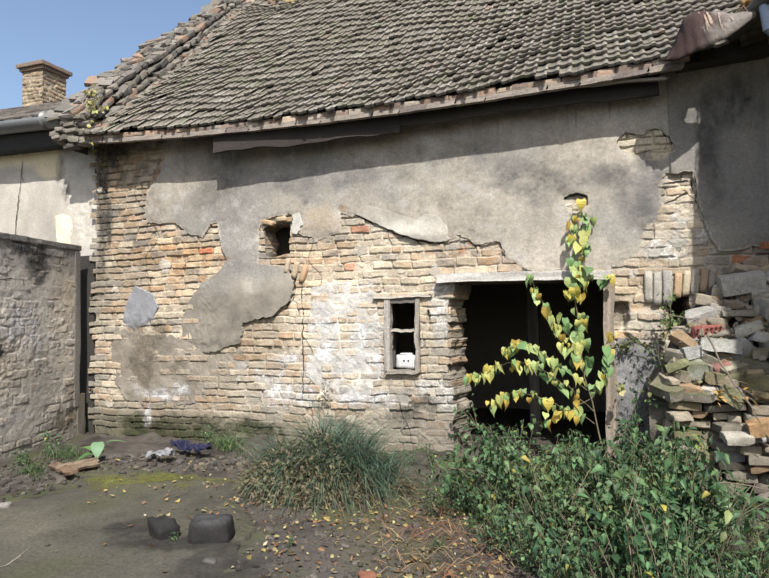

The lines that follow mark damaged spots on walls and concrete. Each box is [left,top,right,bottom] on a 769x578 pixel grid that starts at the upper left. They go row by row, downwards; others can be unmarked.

leakage [12,240,46,283]
crack [258,269,313,404]
flaking render [88,140,531,454]
flaking render [564,196,588,211]
flaking render [618,129,673,160]
flaking render [611,172,769,376]